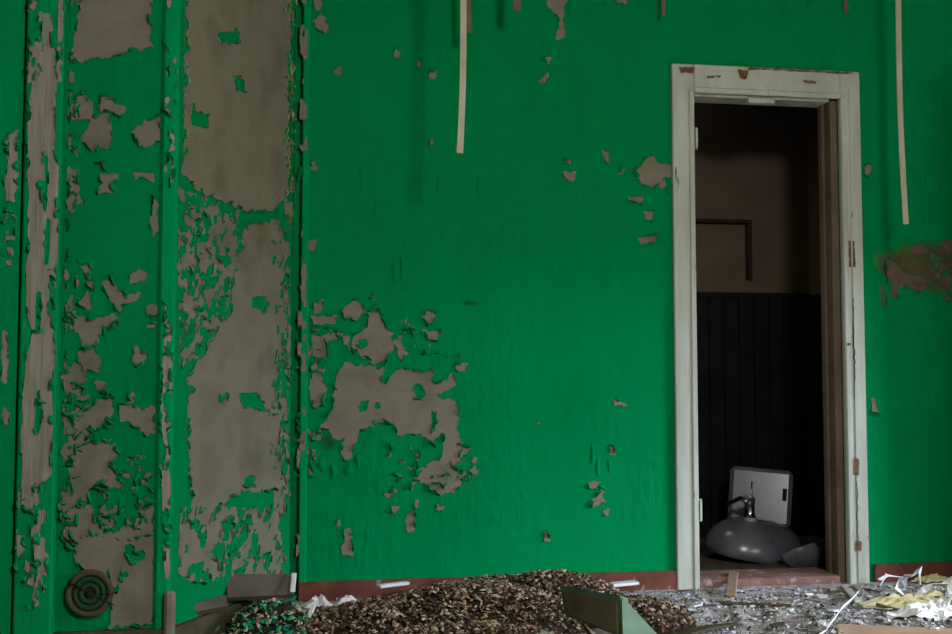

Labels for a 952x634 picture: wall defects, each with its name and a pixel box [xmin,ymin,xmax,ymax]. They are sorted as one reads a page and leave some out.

peeling [547,0,568,40]
peeling [602,150,671,245]
peeling [886,239,952,304]
peeling [0,0,478,630]
peeling [586,481,609,516]